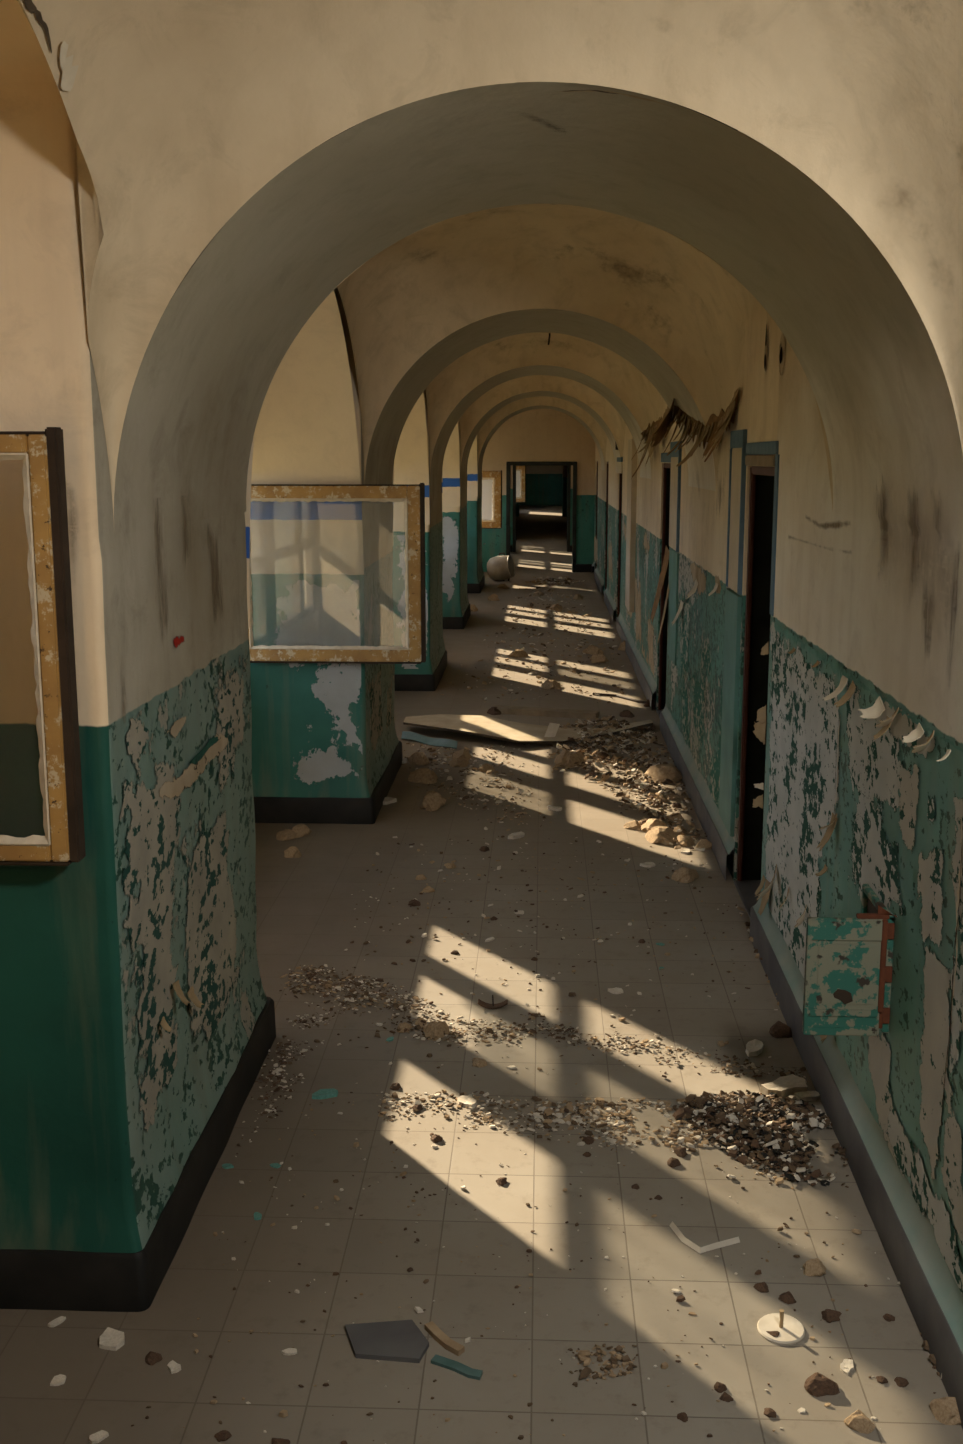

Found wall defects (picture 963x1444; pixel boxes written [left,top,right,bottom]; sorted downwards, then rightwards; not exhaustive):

crack [24,0,79,92]
peeling [631,387,740,479]
peeling [274,580,361,646]
peeling [284,663,362,785]
peeling [393,535,406,647]
peeling [402,516,459,669]
peeling [594,522,723,807]
peeling [752,621,963,1295]